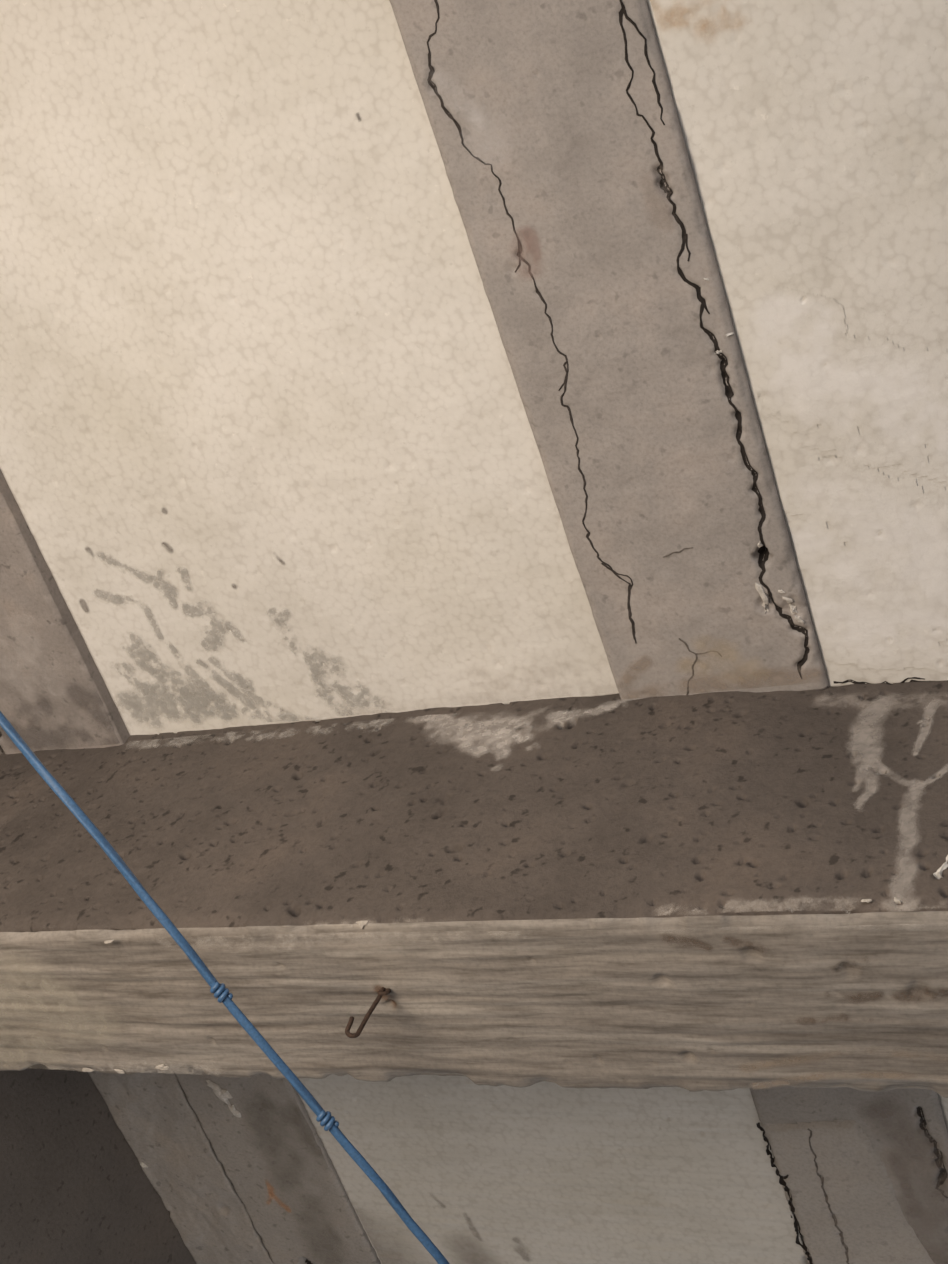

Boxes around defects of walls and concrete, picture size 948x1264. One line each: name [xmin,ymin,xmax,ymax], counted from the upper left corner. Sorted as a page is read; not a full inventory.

crack [427,0,636,643]
crack [619,0,810,679]
crack [679,638,722,696]
crack [834,677,948,685]
crack [756,1122,849,1264]
crack [916,1106,948,1198]